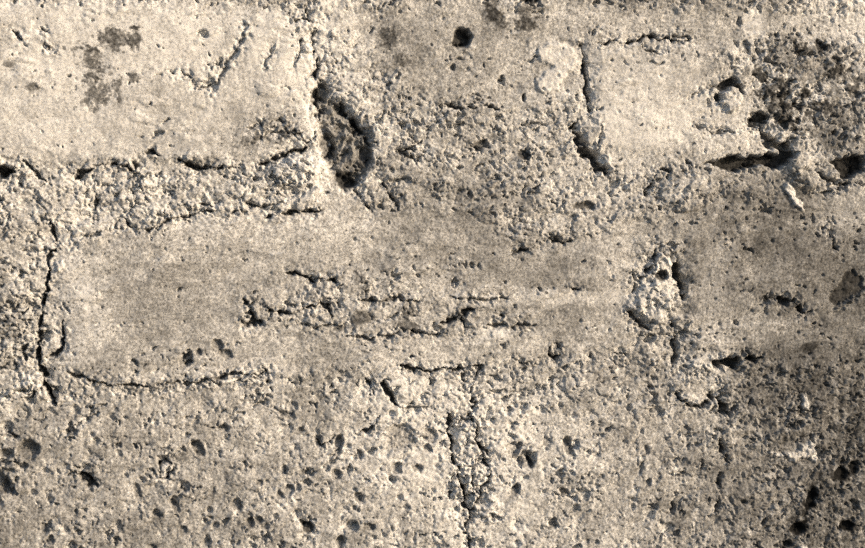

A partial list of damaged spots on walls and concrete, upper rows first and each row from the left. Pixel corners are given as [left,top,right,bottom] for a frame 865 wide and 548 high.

crack [20,0,420,234]
crack [577,31,693,153]
crack [4,220,270,407]
crack [239,269,563,367]
crack [587,351,627,360]
crack [352,413,382,437]
crack [398,362,494,548]
crack [668,500,676,514]
crack [699,433,752,516]